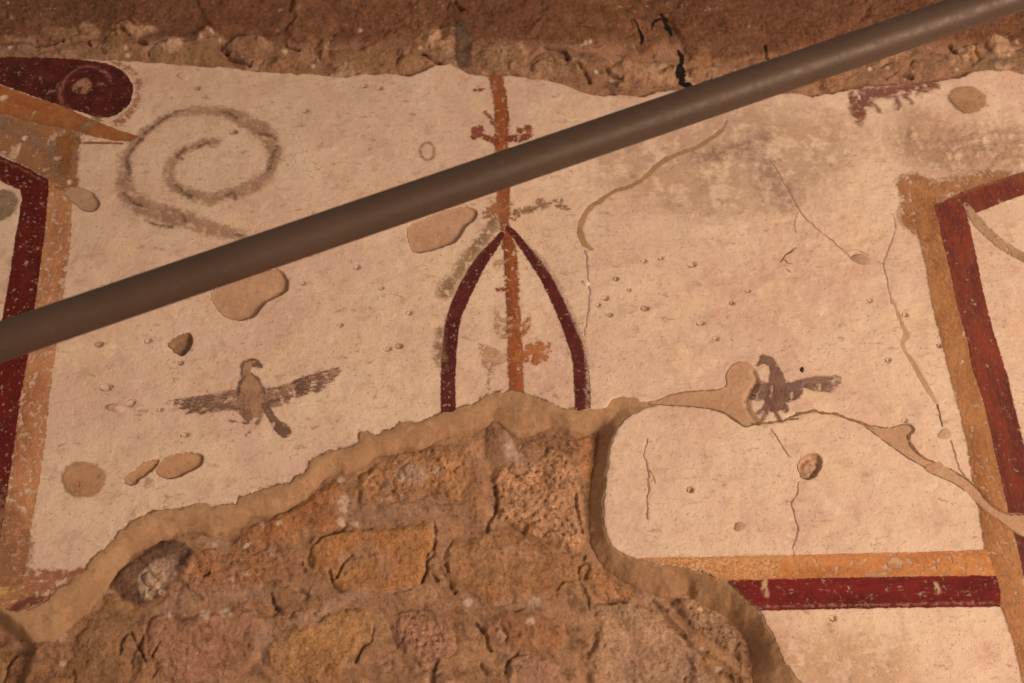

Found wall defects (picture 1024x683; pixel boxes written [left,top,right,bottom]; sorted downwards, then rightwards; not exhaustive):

flaking render [407,206,477,253]
crack [577,120,728,335]
flaking render [211,268,307,321]
spalling [168,333,193,365]
crack [757,161,1024,537]
crack [644,439,656,520]
spalling [798,453,823,480]
spalling [0,421,753,683]
crack [791,481,800,555]